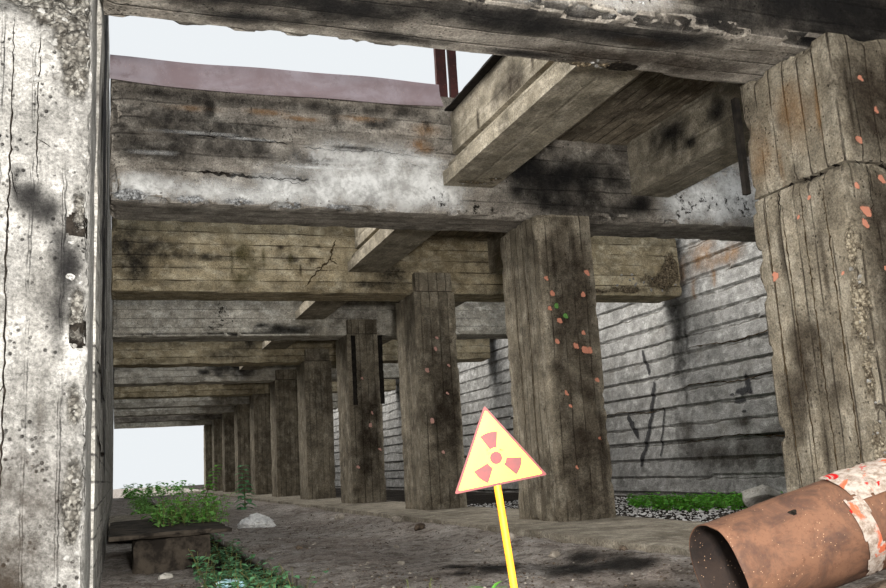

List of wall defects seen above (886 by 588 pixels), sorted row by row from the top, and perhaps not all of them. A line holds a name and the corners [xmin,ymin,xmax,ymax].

damp [633,196,650,210]
crack [305,240,337,287]
crack [607,160,886,484]
damp [552,247,608,496]
damp [0,537,36,588]